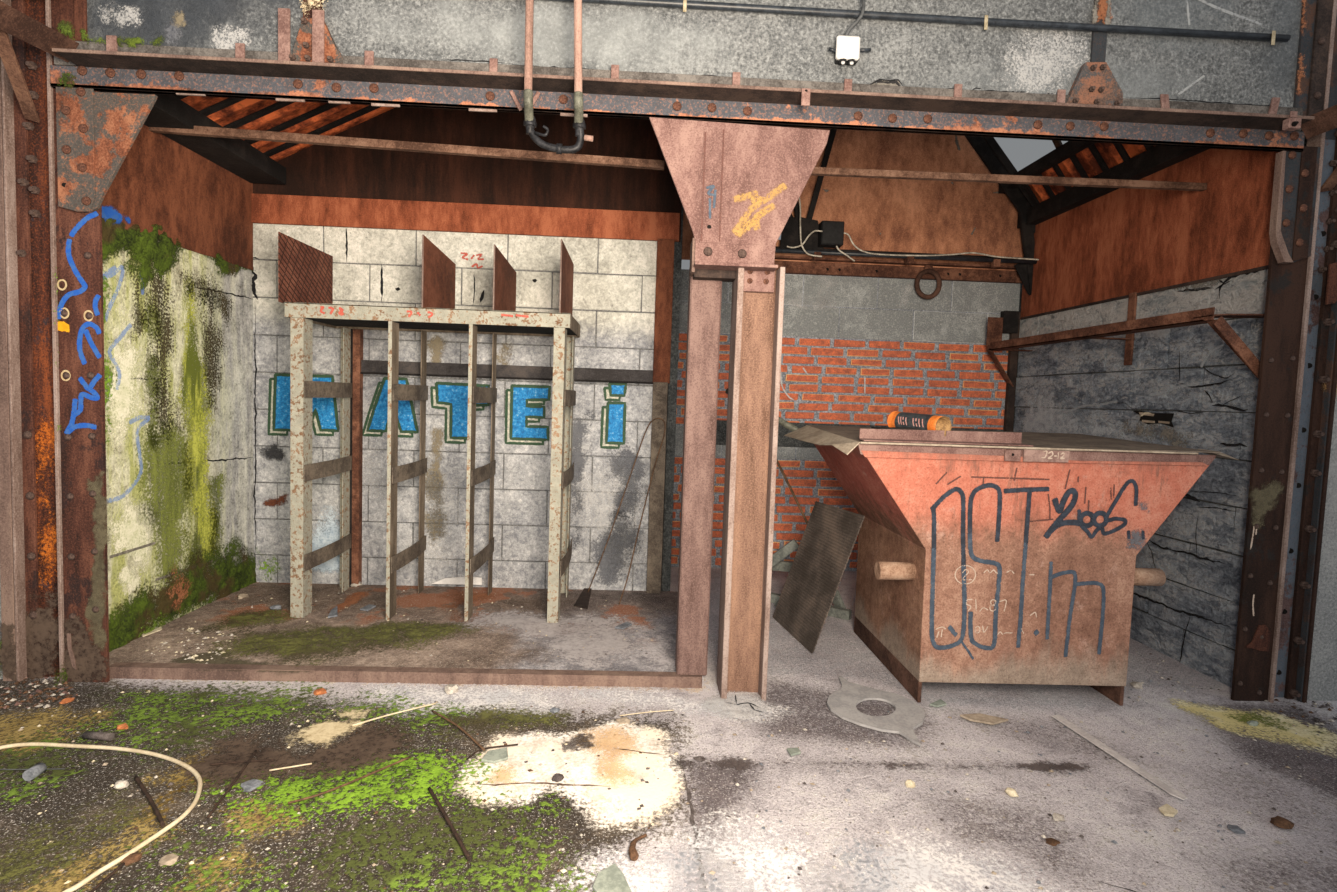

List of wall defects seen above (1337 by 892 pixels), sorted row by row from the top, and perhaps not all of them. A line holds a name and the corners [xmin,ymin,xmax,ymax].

corrosion [1097,0,1113,24]
crack [1178,271,1258,298]
damp [128,257,234,445]
crack [1177,351,1248,414]
corrosion [35,419,55,479]
crack [1220,441,1247,449]
corrosion [39,498,57,588]